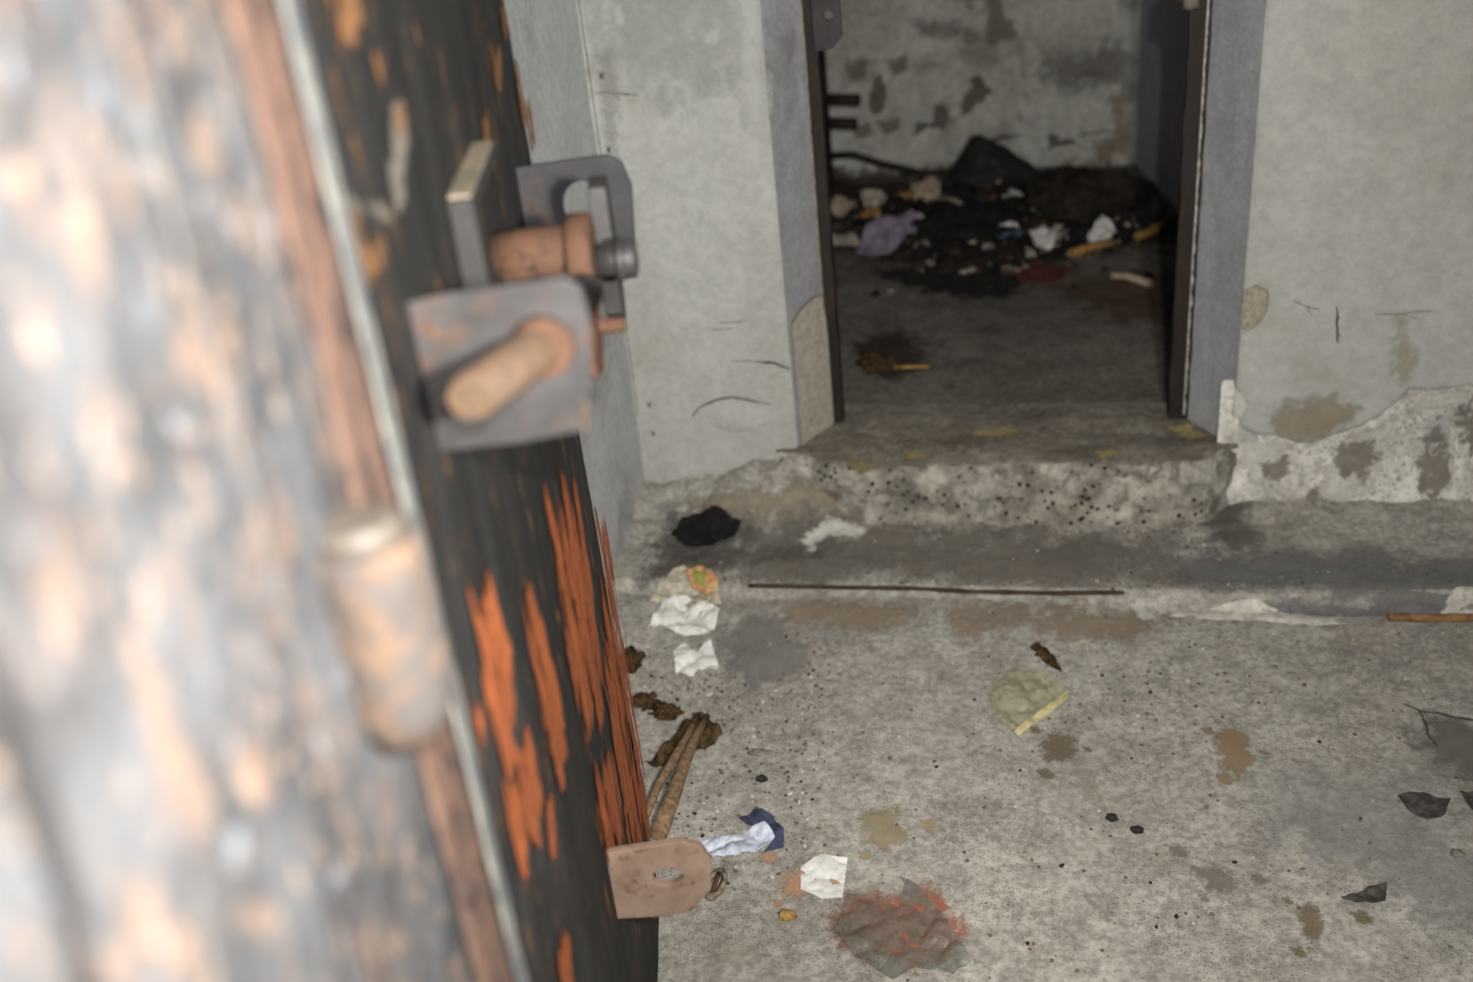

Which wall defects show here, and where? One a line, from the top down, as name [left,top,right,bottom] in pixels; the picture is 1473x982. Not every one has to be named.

leakage [916,0,1016,46]
leakage [1042,42,1134,99]
peeling [847,459,882,474]
leakage [1272,394,1361,439]
flaking render [1167,380,1473,505]
leakage [739,501,1473,617]
leakage [714,616,803,688]